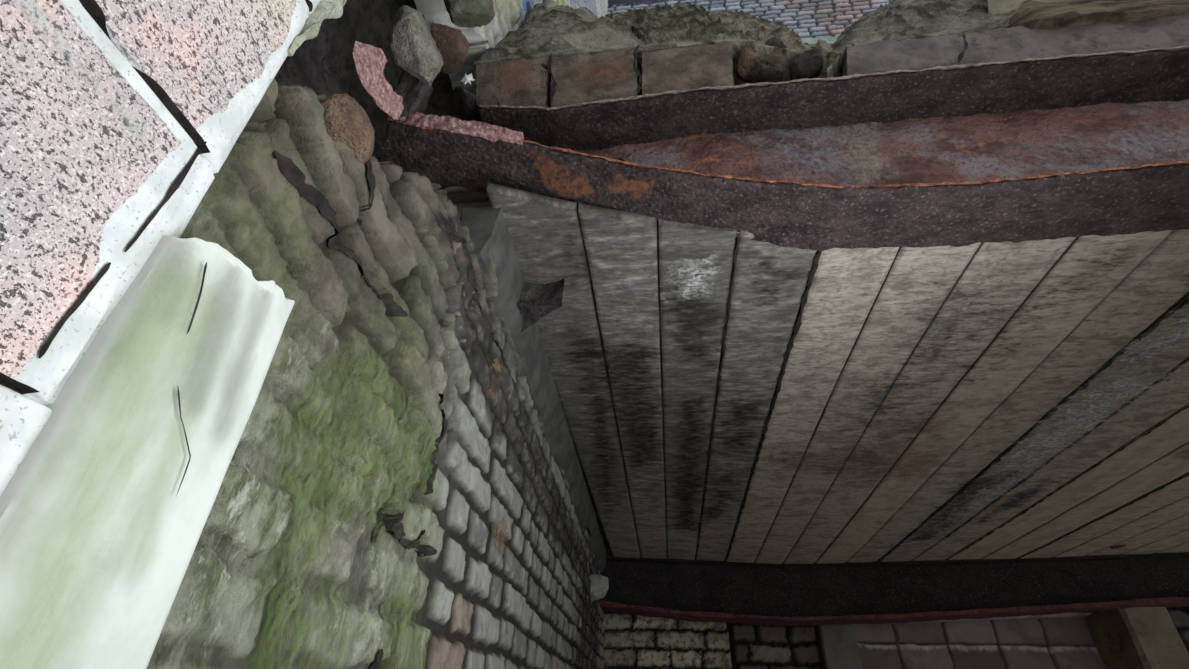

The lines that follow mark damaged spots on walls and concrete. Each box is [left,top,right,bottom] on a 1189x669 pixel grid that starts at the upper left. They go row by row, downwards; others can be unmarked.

corrosion [532,152,592,198]
damp [663,287,726,366]
damp [570,330,760,531]